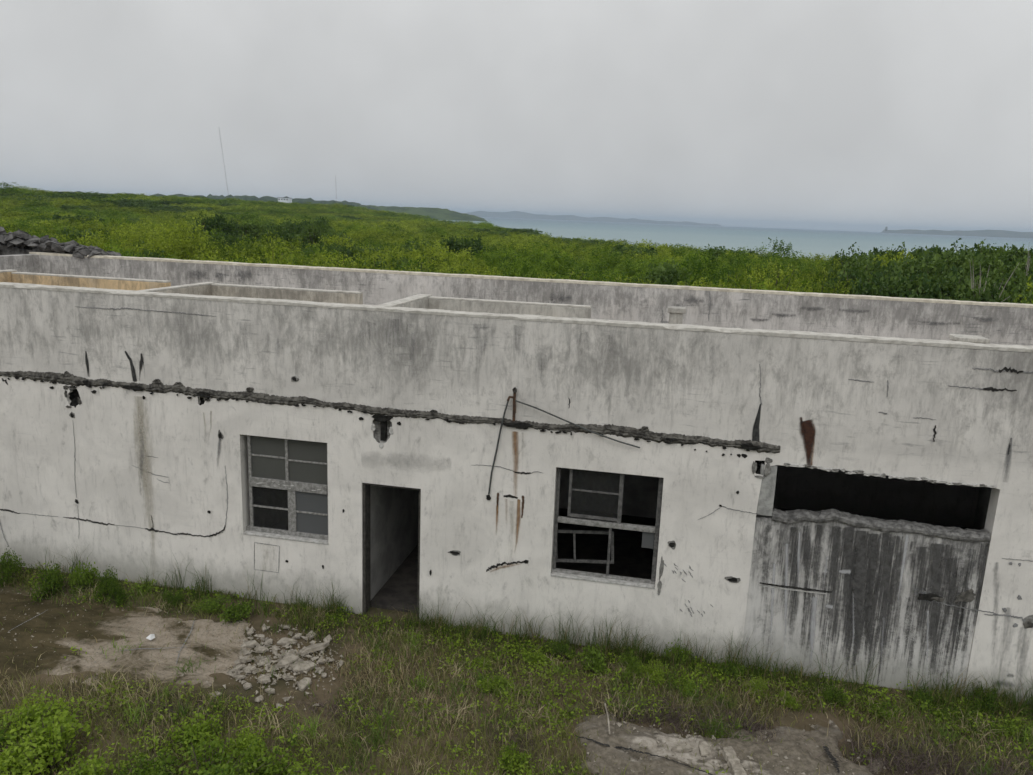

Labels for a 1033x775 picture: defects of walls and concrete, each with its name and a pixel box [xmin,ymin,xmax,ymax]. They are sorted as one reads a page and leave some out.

crack [0,426,228,545]
spalling [0,371,997,488]
corrosion [496,493,524,543]
corrosion [800,417,815,467]
crack [948,367,1033,392]
damp [762,525,997,683]